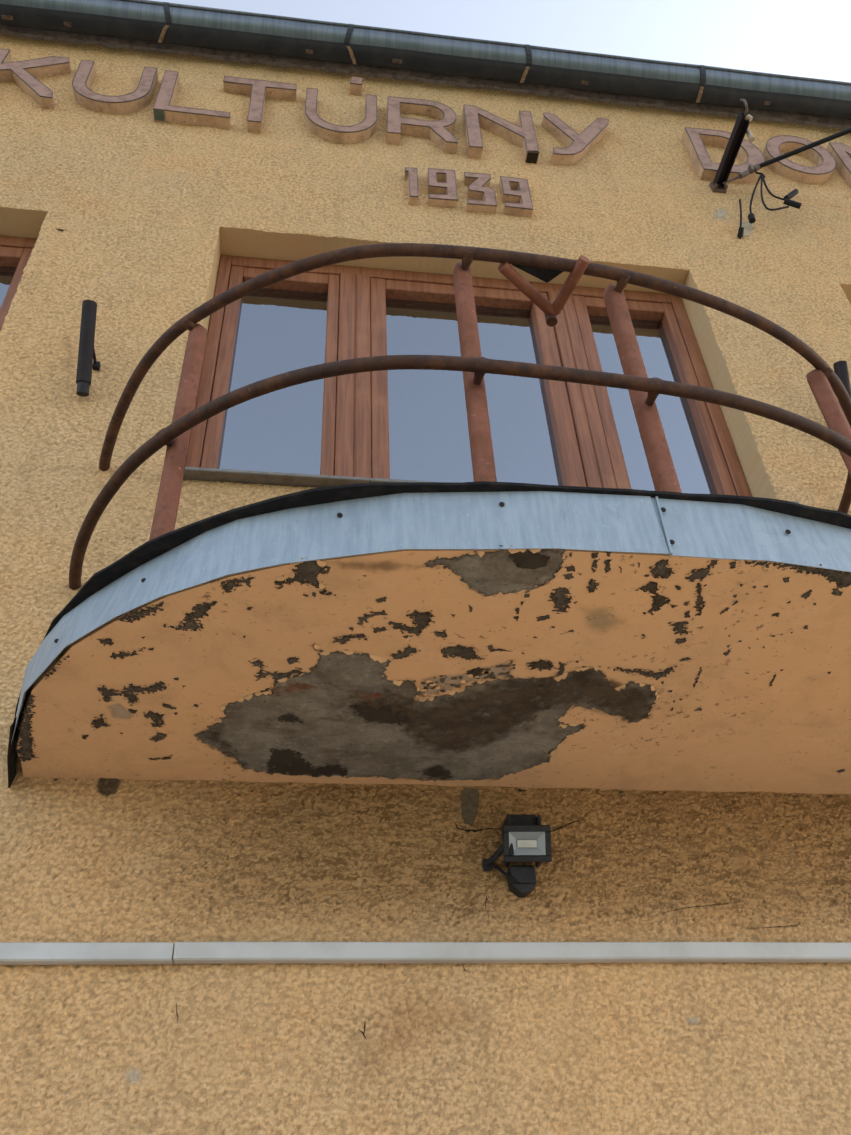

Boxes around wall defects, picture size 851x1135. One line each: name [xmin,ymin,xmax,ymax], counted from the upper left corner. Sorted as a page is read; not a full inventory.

peeling [115,577,254,632]
peeling [274,558,336,597]
spalling [424,545,622,633]
peeling [635,557,851,645]
peeling [97,636,154,659]
peeling [82,678,185,743]
spalling [194,597,703,782]